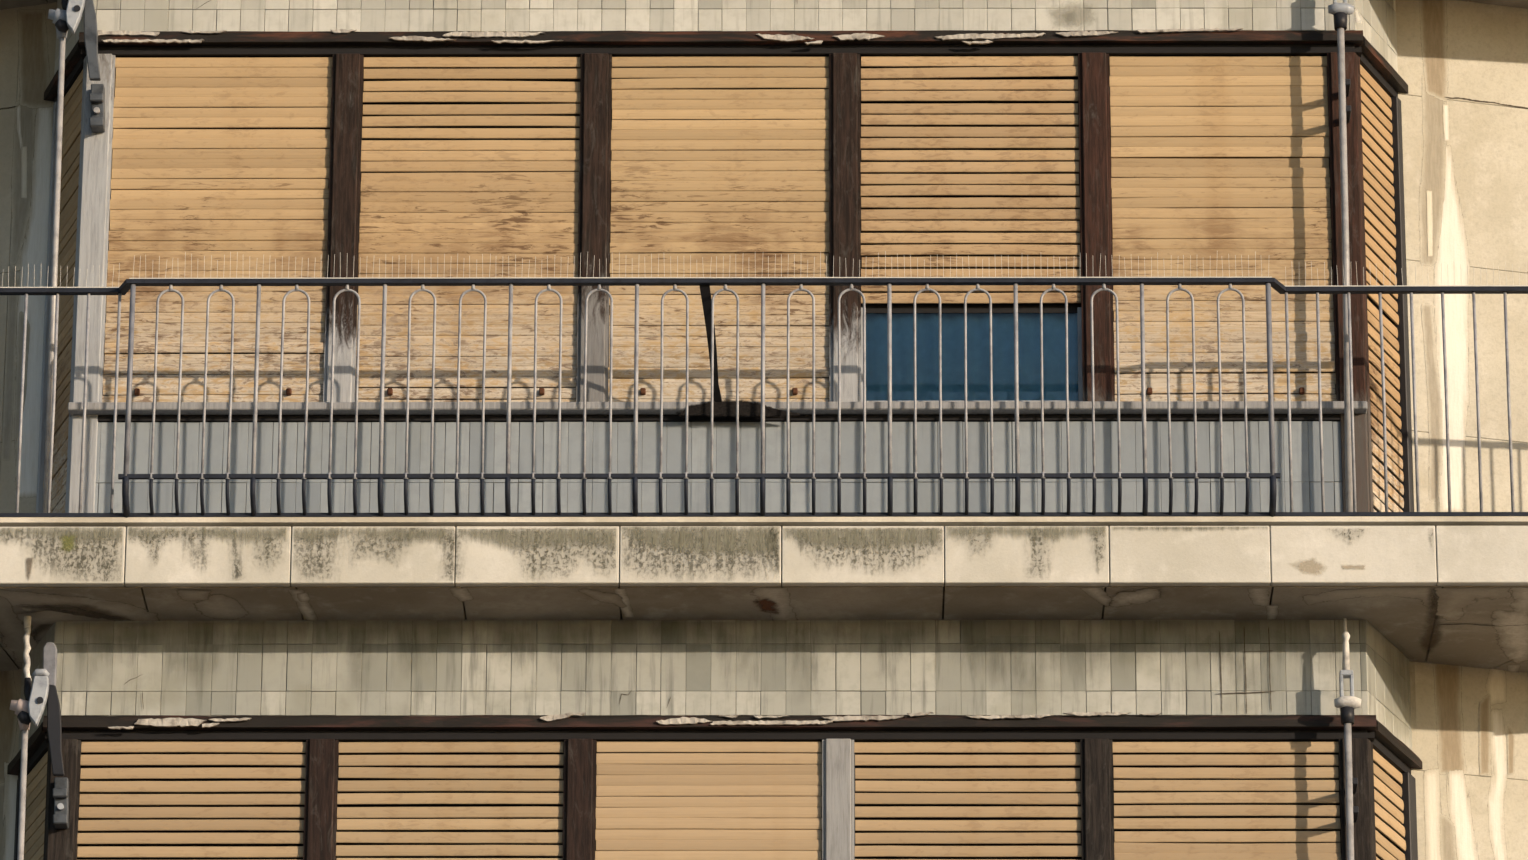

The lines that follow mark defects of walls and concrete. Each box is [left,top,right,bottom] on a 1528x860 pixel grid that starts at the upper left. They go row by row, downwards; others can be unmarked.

leakage [2,9,53,498]
leakage [676,399,807,418]
leakage [1300,560,1321,573]
rust [755,599,778,614]
leakage [0,526,1245,860]
peeling [108,718,252,730]
peeling [540,712,586,722]
peeling [656,712,933,726]
peeling [966,711,1162,720]
leakage [1303,588,1528,860]